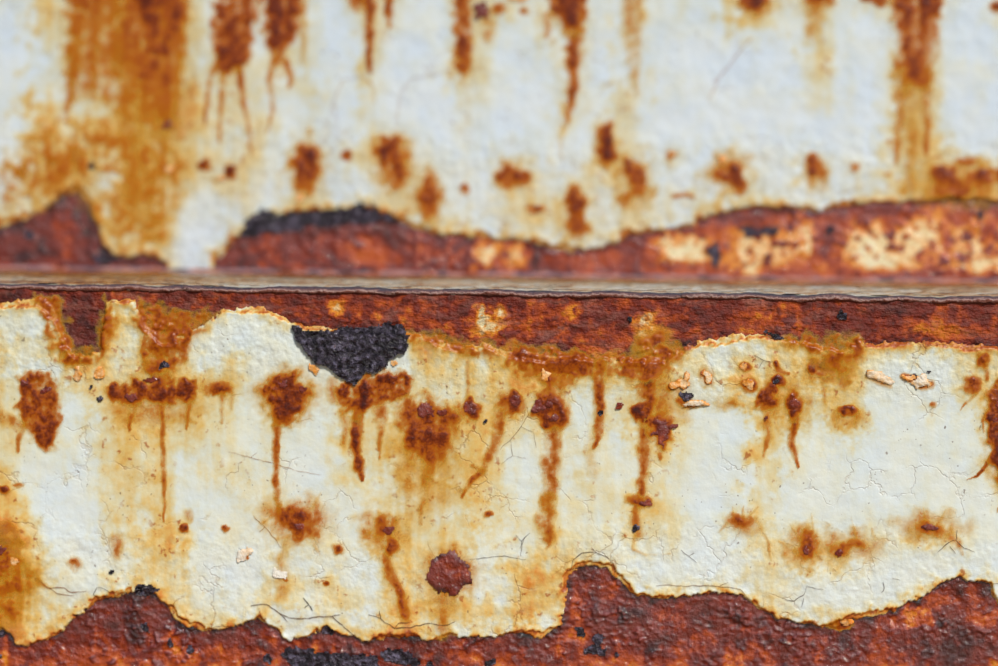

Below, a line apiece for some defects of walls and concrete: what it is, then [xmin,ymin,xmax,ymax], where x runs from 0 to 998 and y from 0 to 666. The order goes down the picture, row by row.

rust [0,0,189,241]
rust [203,0,305,155]
rust [544,0,588,130]
peeling [0,191,167,268]
peeling [213,198,998,279]
rust [0,370,63,452]
rust [34,295,233,522]
rust [257,369,326,544]
peeling [0,288,998,386]
rust [329,330,684,548]
peeling [866,370,934,389]
peeling [0,565,998,666]